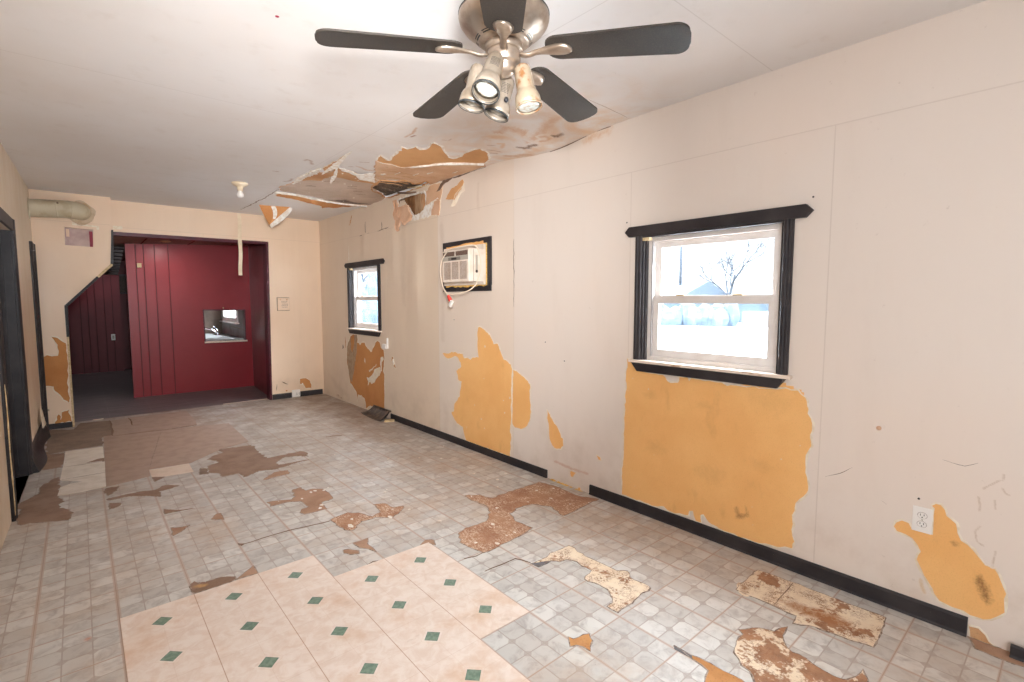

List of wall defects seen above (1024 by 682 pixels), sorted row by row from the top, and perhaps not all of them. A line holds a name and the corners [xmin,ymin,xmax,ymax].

peeling [372,142,491,203]
peeling [40,336,72,428]
peeling [346,334,396,409]
peeling [442,326,532,457]
peeling [16,453,74,525]
peeling [198,445,309,480]
peeling [267,487,404,555]
peeling [458,470,599,553]
peeling [621,358,815,549]
peeling [530,545,651,613]
peeling [673,570,886,682]
peeling [893,502,1024,667]